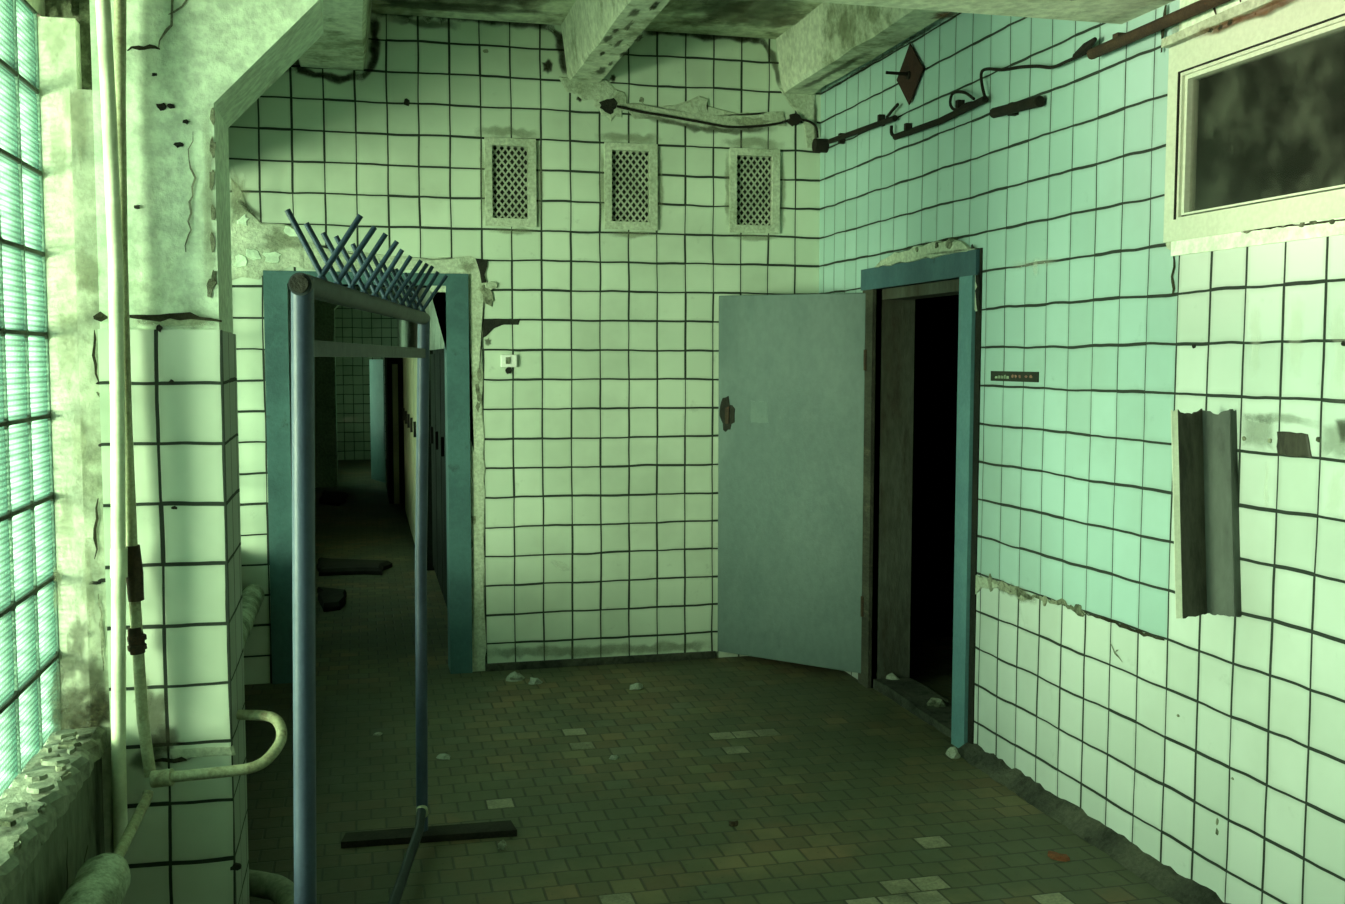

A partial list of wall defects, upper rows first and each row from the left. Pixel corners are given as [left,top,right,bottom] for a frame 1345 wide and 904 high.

crack [127,0,187,51]
leakage [285,0,567,84]
spalling [975,574,1164,641]
peeling [0,729,93,853]